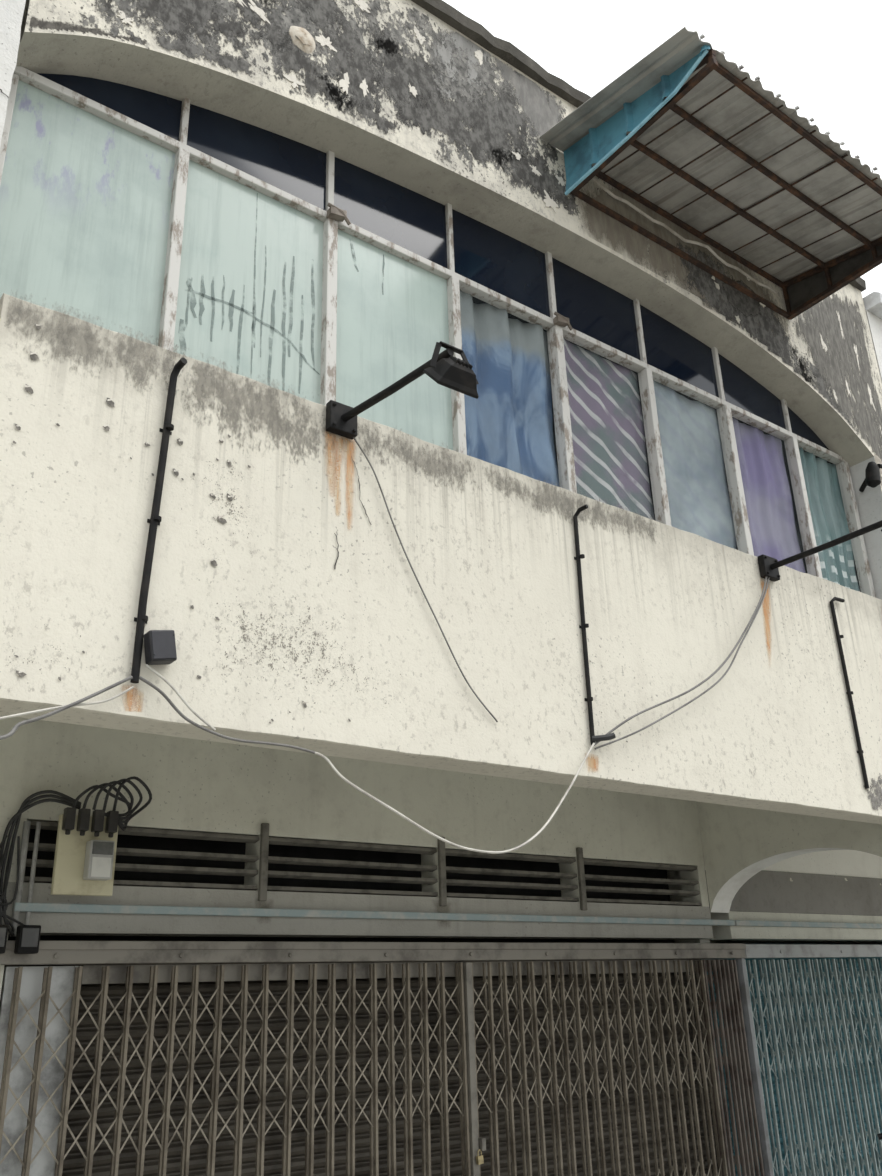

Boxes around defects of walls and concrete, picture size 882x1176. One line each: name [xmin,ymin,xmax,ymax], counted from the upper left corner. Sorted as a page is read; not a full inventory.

leakage [30,0,882,461]
rust [762,582,770,648]